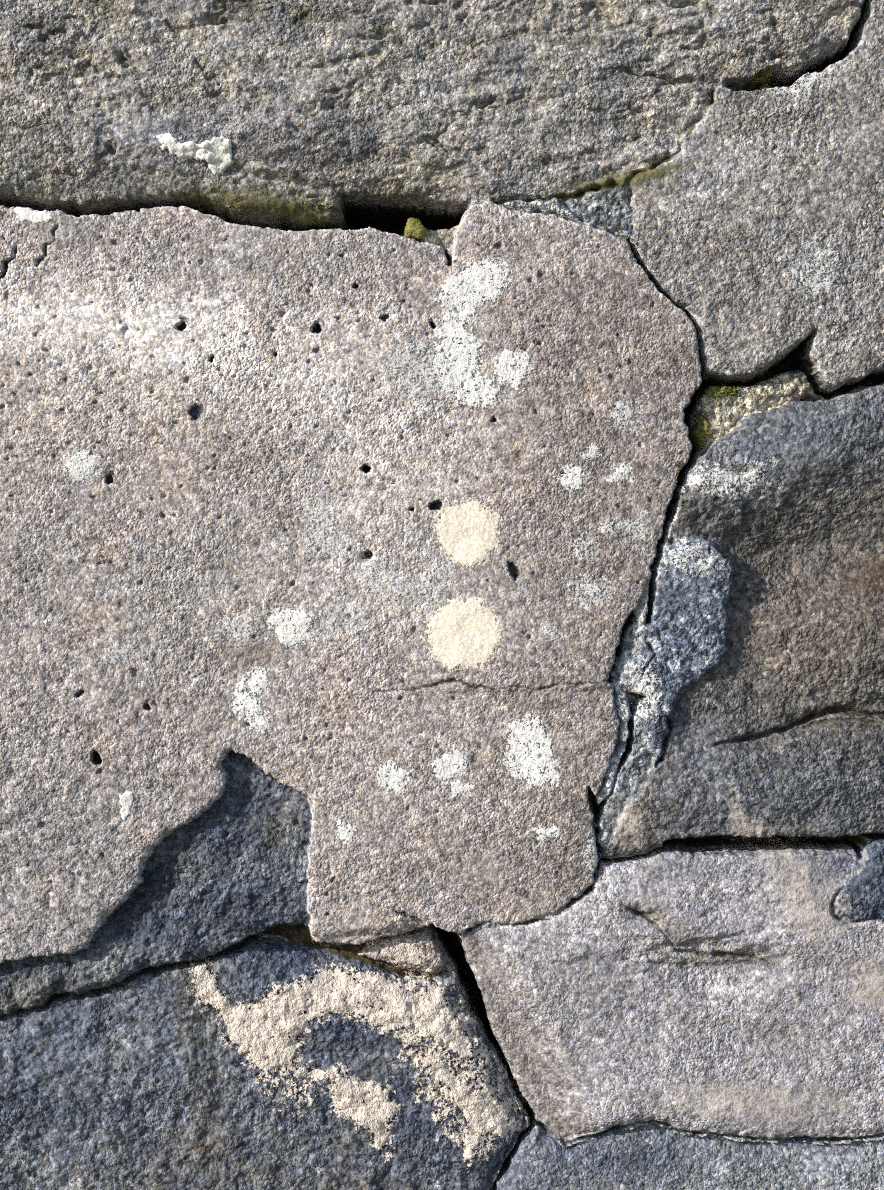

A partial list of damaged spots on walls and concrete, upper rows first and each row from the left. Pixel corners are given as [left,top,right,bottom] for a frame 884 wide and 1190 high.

crack [816,0,871,72]
crack [627,72,677,86]
crack [745,68,789,92]
crack [0,226,60,282]
crack [203,185,463,266]
crack [376,91,884,694]
crack [0,692,884,1190]